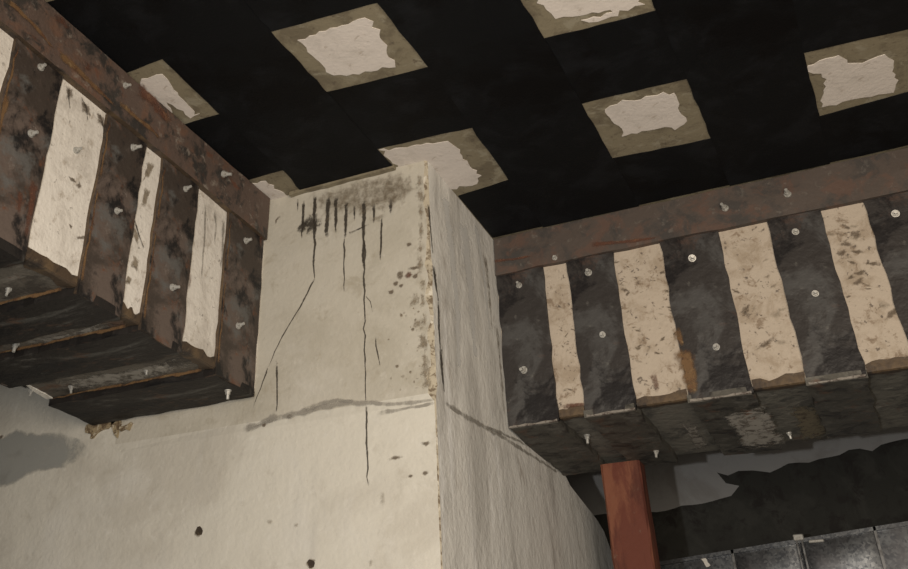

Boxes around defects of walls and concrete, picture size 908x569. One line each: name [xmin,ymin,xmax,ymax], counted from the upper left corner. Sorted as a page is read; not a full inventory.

rust [141,86,169,121]
rust [18,184,37,234]
leakage [297,182,405,266]
rust [0,288,59,305]
crack [247,240,556,481]
peeling [85,420,133,439]
leakage [0,432,75,485]